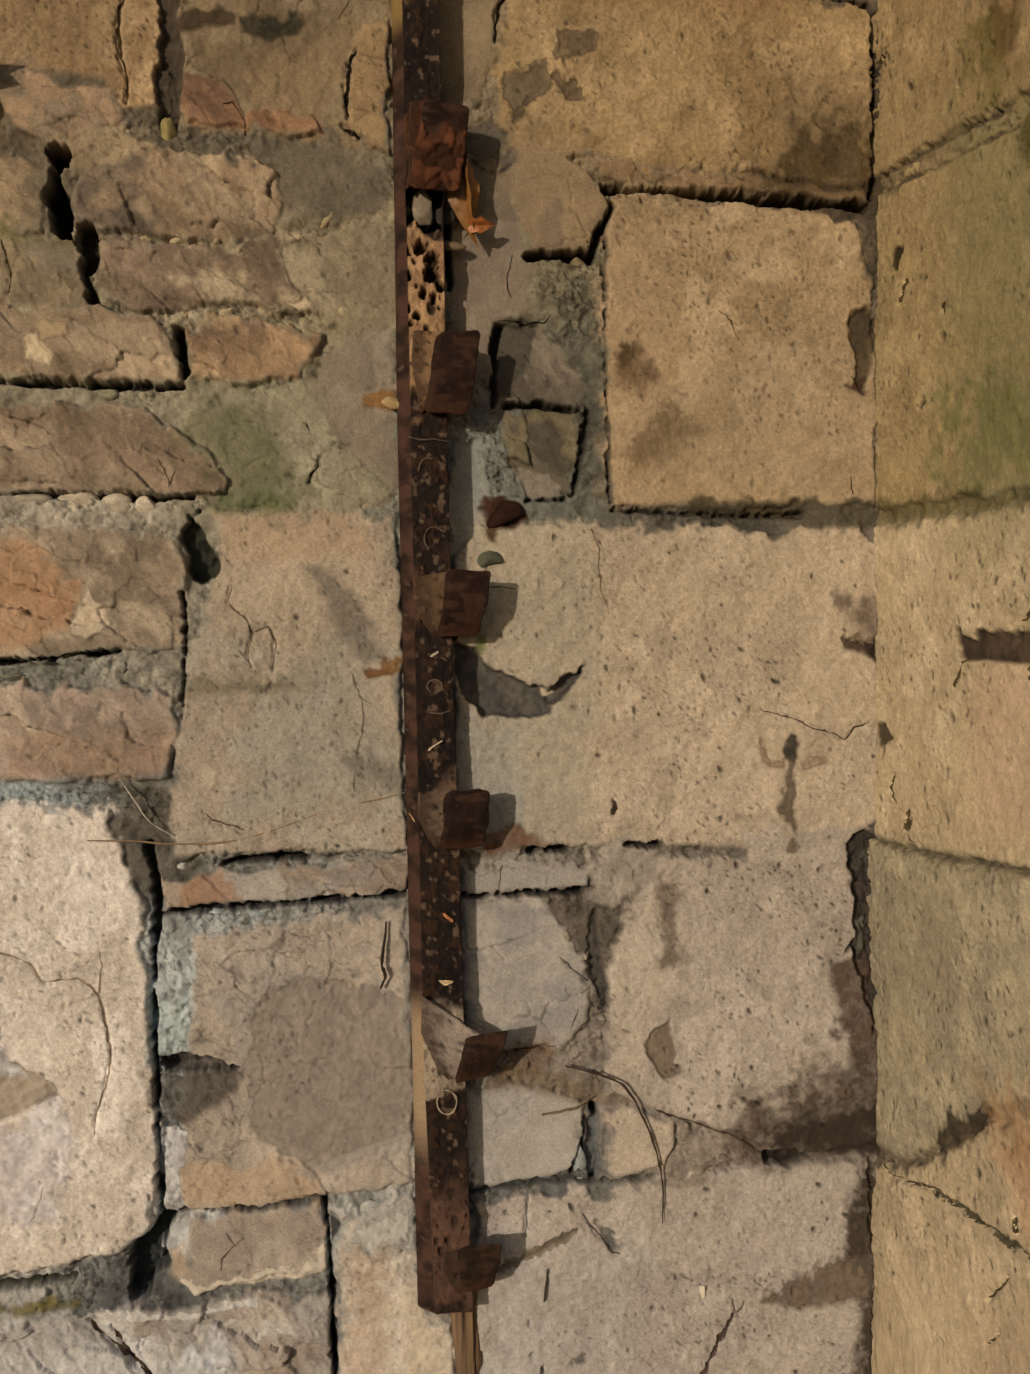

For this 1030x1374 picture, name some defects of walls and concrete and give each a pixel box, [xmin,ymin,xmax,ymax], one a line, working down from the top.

spalling [846,306,876,394]
rust [478,496,527,542]
spalling [958,628,1030,663]
spalling [453,643,582,717]
spalling [0,1056,57,1119]
crack [91,1318,153,1374]
crack [700,1299,744,1374]